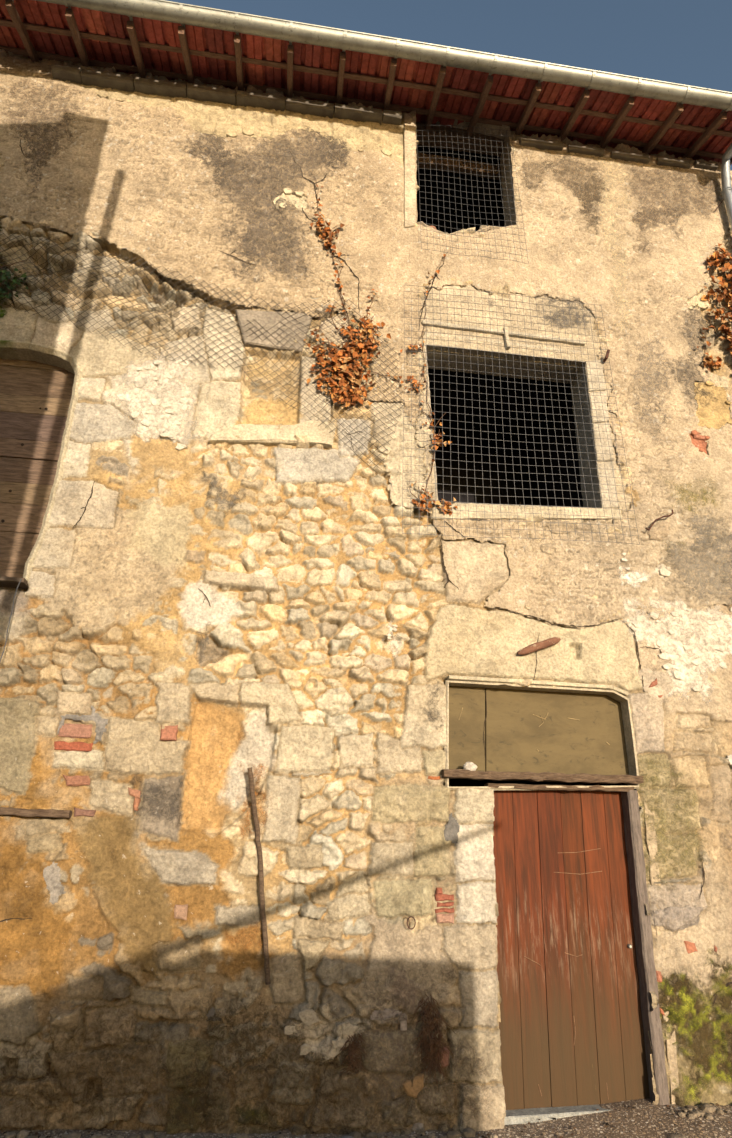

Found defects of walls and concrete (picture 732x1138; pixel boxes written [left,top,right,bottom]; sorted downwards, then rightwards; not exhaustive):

leakage [2,81,80,192]
leakage [186,128,350,282]
crack [419,252,448,328]
leakage [523,152,720,330]
peeling [116,353,200,451]
flaking render [378,411,431,511]
crack [440,520,466,589]
peeling [284,1003,358,1063]
leakage [658,973,694,1025]